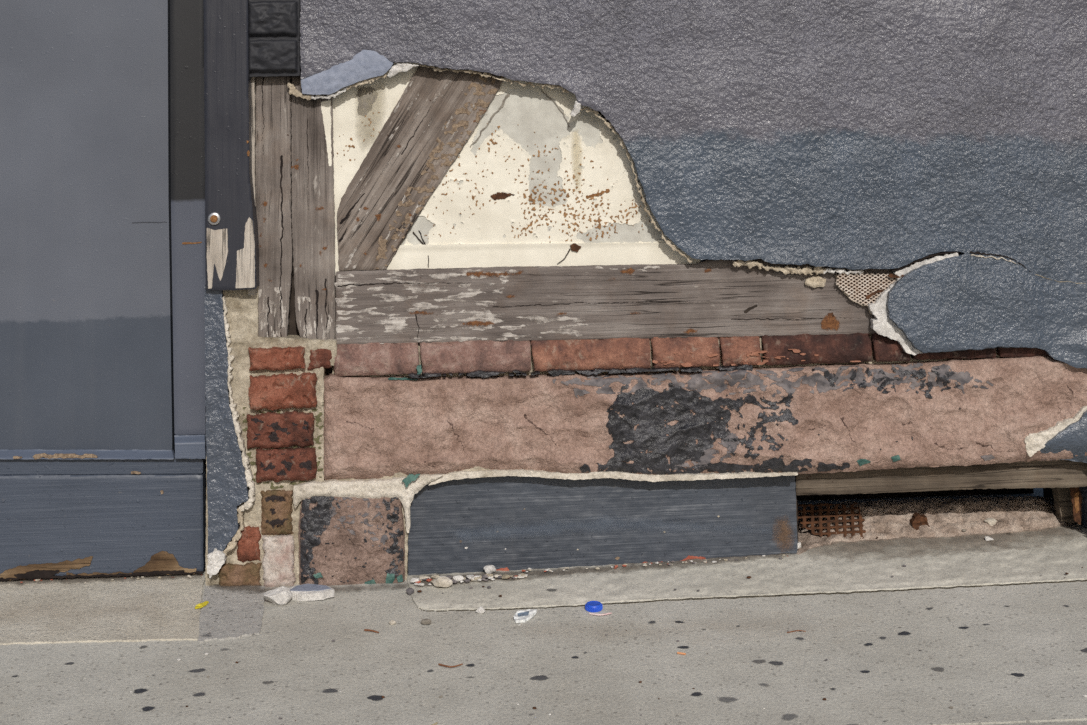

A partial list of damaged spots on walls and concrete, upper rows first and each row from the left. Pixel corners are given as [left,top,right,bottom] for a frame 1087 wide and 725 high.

peeling [206,50,692,344]
rust [424,126,650,252]
crack [890,251,1079,284]
peeling [388,252,993,475]
peeling [0,296,255,581]
peeling [402,473,420,487]
flaking render [1024,406,1087,457]
peeling [300,496,531,586]
peeling [586,555,766,570]